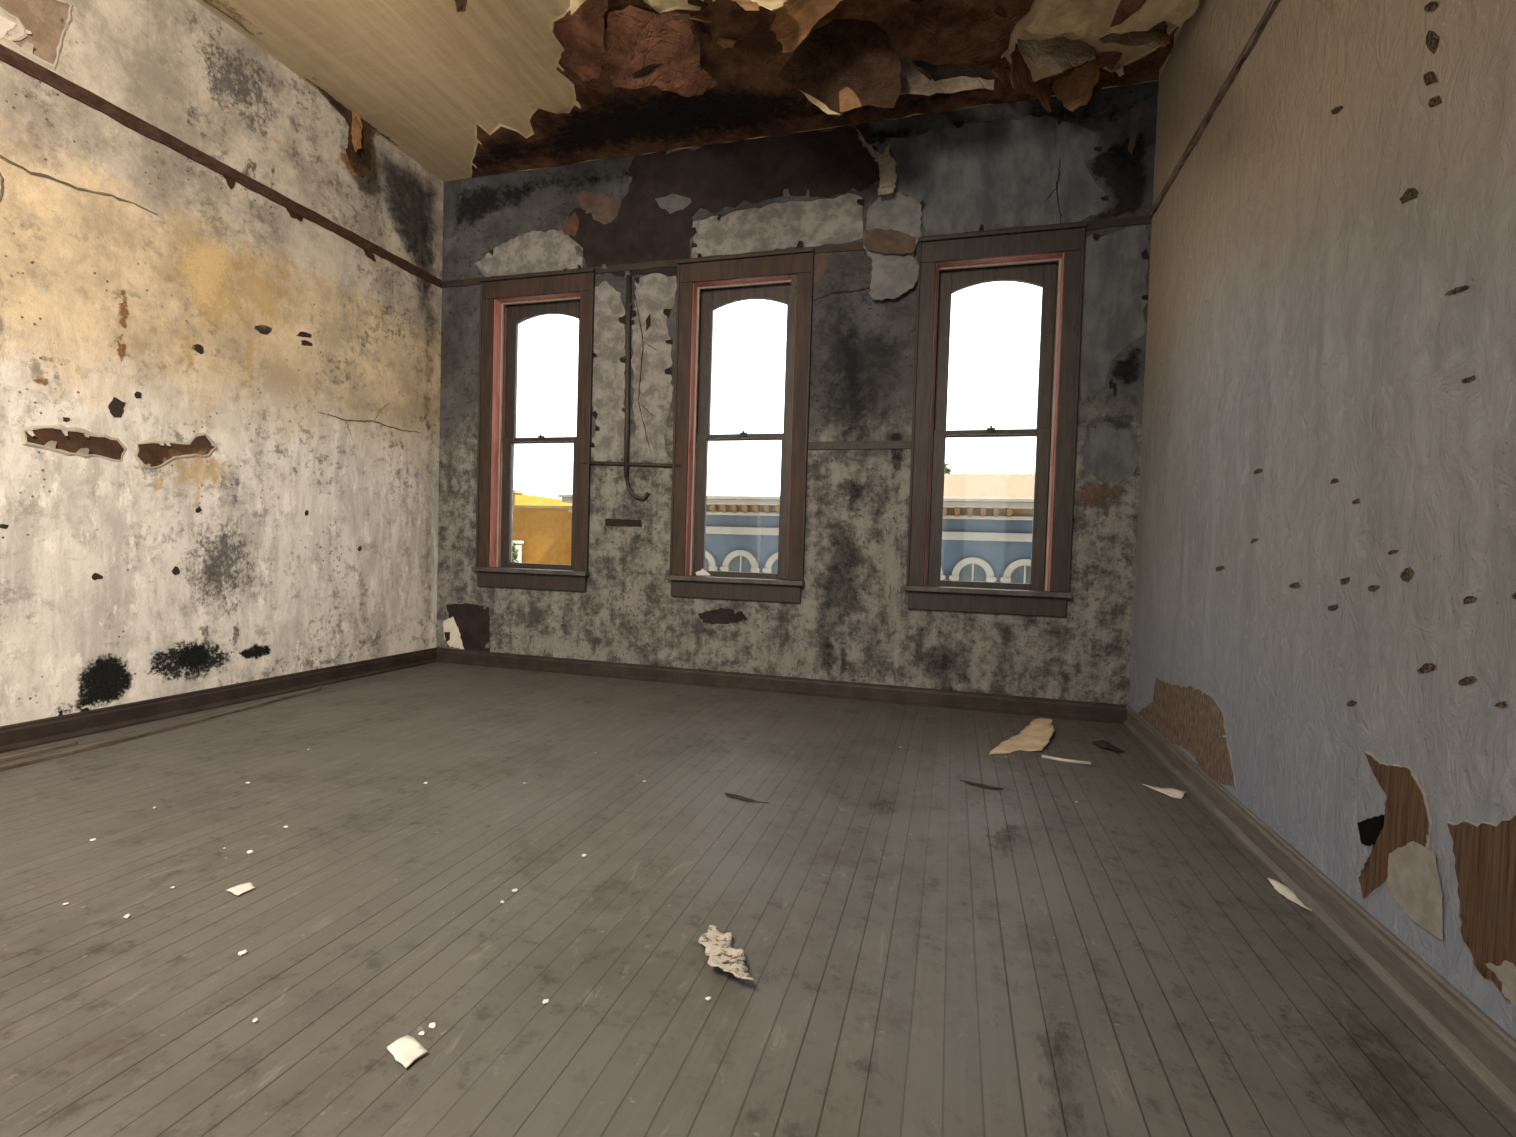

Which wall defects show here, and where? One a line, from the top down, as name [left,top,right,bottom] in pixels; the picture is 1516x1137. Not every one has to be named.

peeling [0,0,73,71]
peeling [454,0,467,12]
peeling [306,78,399,178]
crack [0,155,158,215]
peeling [470,0,1179,462]
spalling [254,325,272,335]
spalling [297,331,313,346]
spalling [108,392,142,418]
peeling [19,417,218,470]
damp [879,513,905,675]
damp [521,631,638,664]
peeling [1357,751,1516,1007]